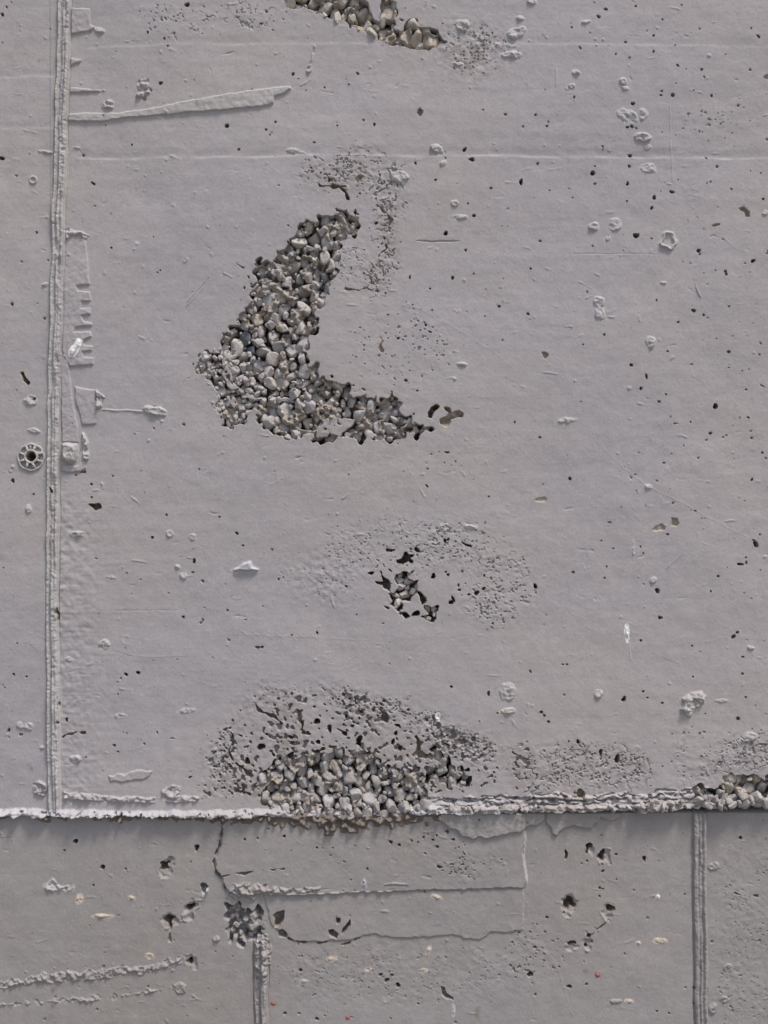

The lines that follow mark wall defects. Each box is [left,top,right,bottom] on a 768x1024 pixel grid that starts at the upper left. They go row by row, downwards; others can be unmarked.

spalling [124,0,442,58]
spalling [184,140,488,484]
spalling [231,499,545,644]
crack [212,825,285,893]
peeling [156,671,768,1024]
crack [287,937,361,946]